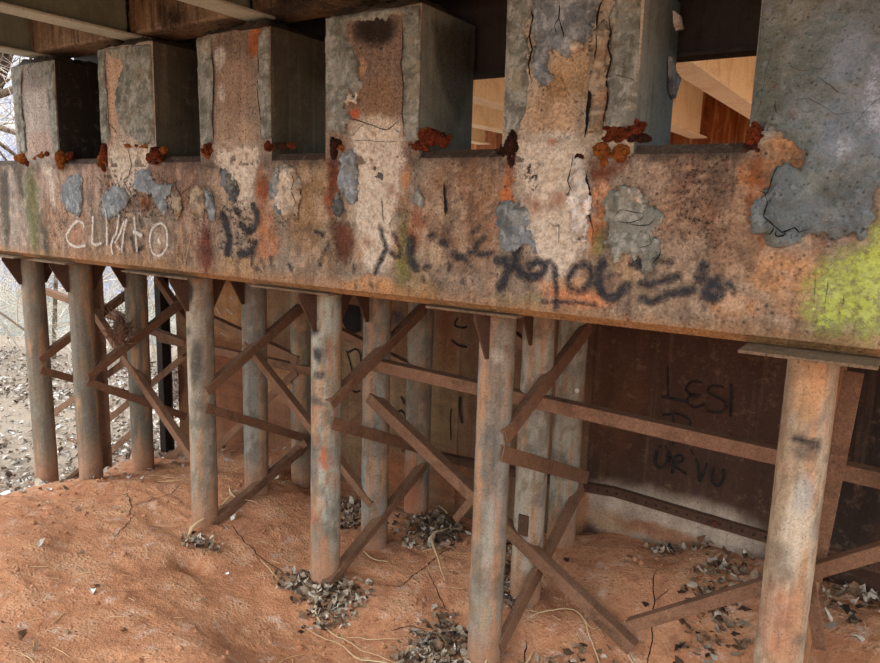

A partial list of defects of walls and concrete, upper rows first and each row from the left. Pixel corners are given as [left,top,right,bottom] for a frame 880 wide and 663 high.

peeling [504,0,641,137]
peeling [747,0,880,248]
peeling [99,168,254,261]
spalling [331,149,359,262]
spalling [494,199,538,254]
spalling [566,155,727,279]